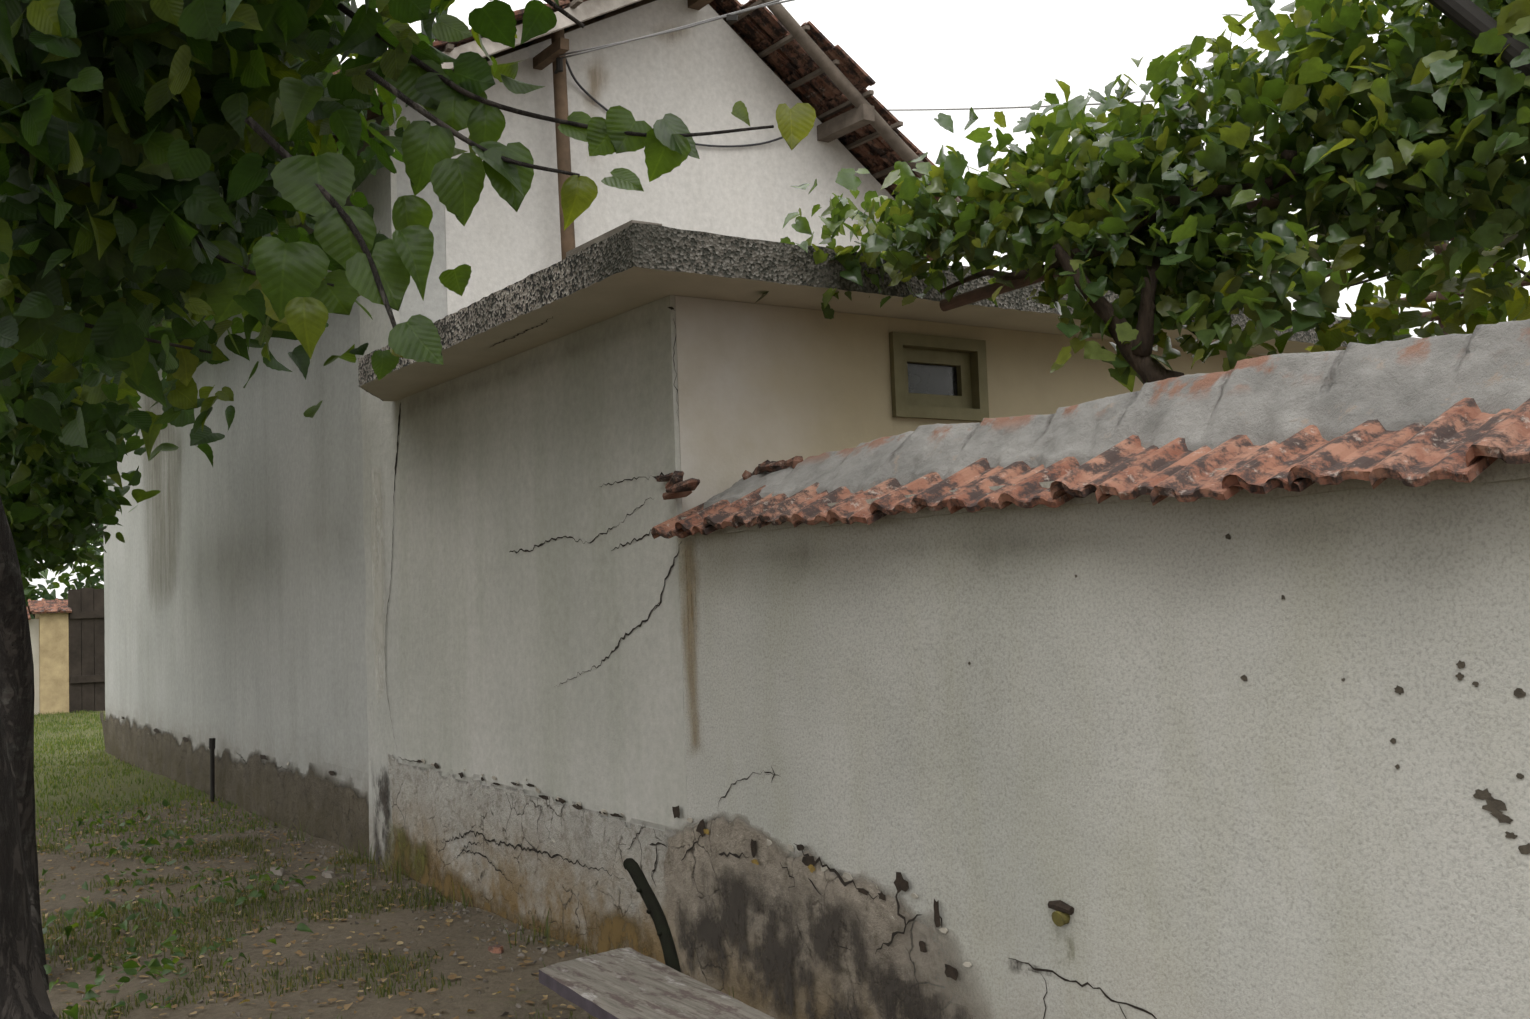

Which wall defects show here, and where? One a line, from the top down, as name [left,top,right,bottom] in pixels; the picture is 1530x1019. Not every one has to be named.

crack [384,403,421,764]
crack [510,472,682,685]
flaking render [100,710,370,858]
flaking render [388,754,972,1019]
crack [1009,958,1157,1019]